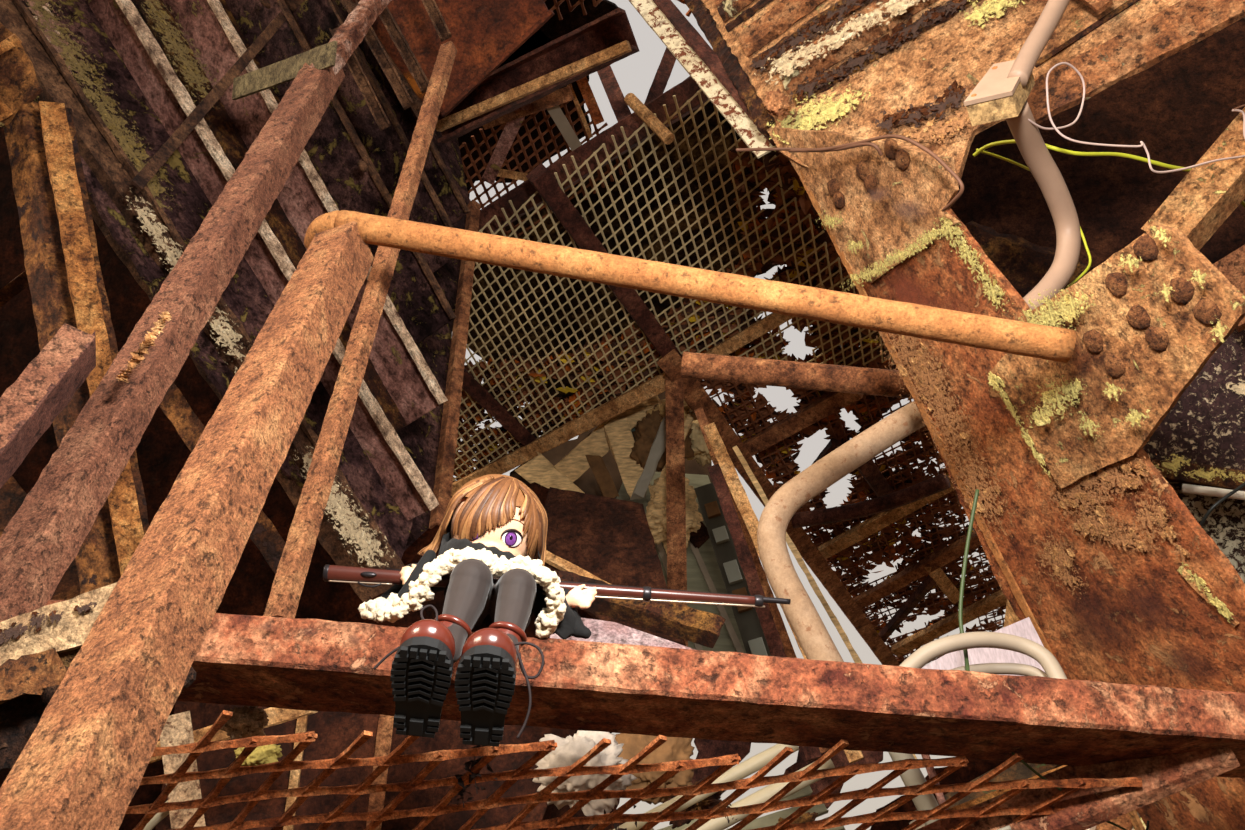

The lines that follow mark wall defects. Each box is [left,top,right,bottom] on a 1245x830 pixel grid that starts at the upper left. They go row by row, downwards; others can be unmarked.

peeling [754,0,925,85]
peeling [25,0,183,273]
peeling [207,307,250,373]
peeling [1210,315,1230,343]
peeling [875,331,1024,550]
peeling [987,371,1245,623]
rust [0,648,69,703]
rust [170,701,270,731]
rust [119,760,171,830]
rust [196,711,591,830]
rust [691,738,751,783]
rust [784,746,883,809]